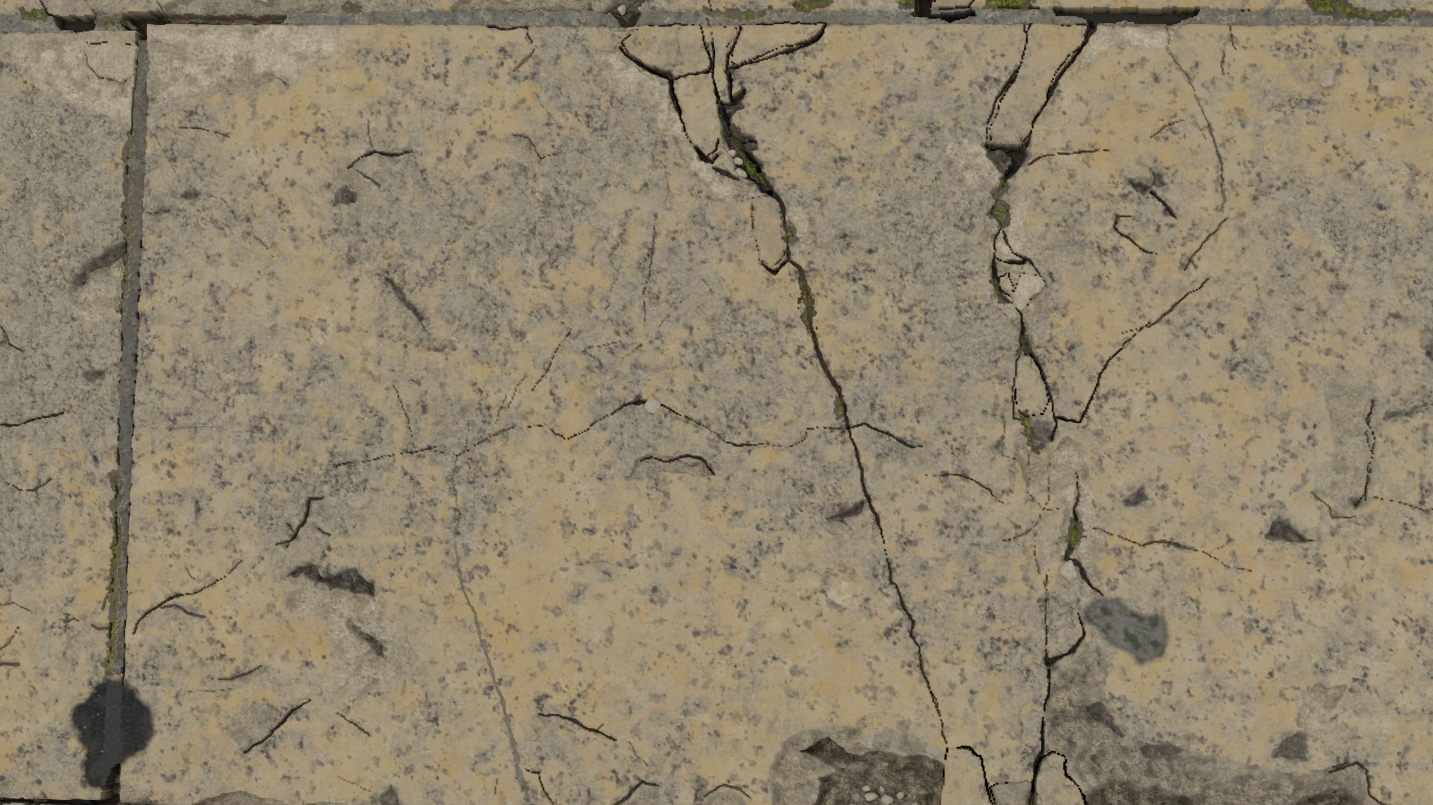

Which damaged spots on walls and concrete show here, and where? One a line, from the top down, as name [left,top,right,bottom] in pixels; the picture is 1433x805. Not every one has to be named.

crack [0,325,25,353]
crack [0,412,64,428]
crack [133,0,1252,805]
crack [7,479,52,493]
crack [0,569,111,668]
damp [1078,592,1175,670]
damp [66,672,162,796]
spalling [623,786,667,805]
spalling [704,787,748,805]
spalling [769,725,949,805]
spalling [1044,641,1379,805]